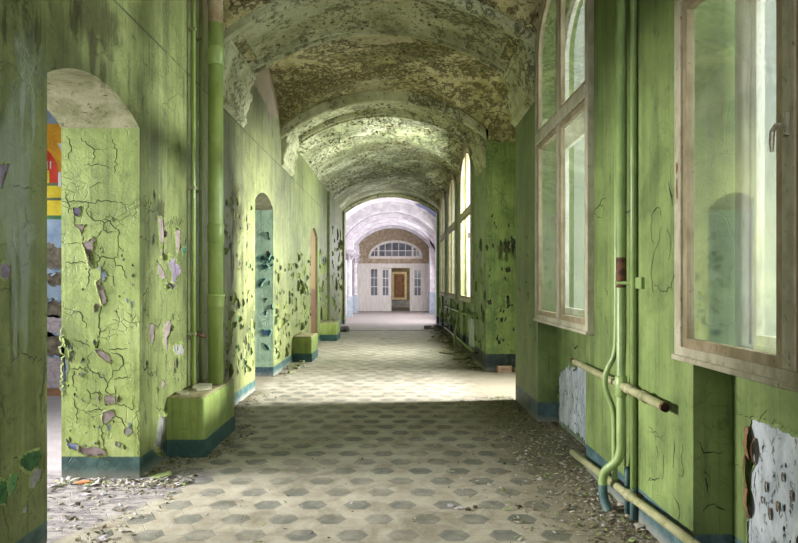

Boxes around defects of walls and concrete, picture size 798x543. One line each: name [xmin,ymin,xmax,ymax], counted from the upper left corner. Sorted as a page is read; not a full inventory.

peeling [72,206,108,313]
peeling [148,216,186,292]
peeling [223,196,343,380]
peeling [438,235,531,354]
peeling [47,296,105,402]
peeling [66,423,133,458]
crack [72,302,167,453]
peeling [152,410,168,458]
peeling [147,315,185,394]
peeling [557,363,586,447]
crack [648,409,784,519]
peeling [742,417,798,543]